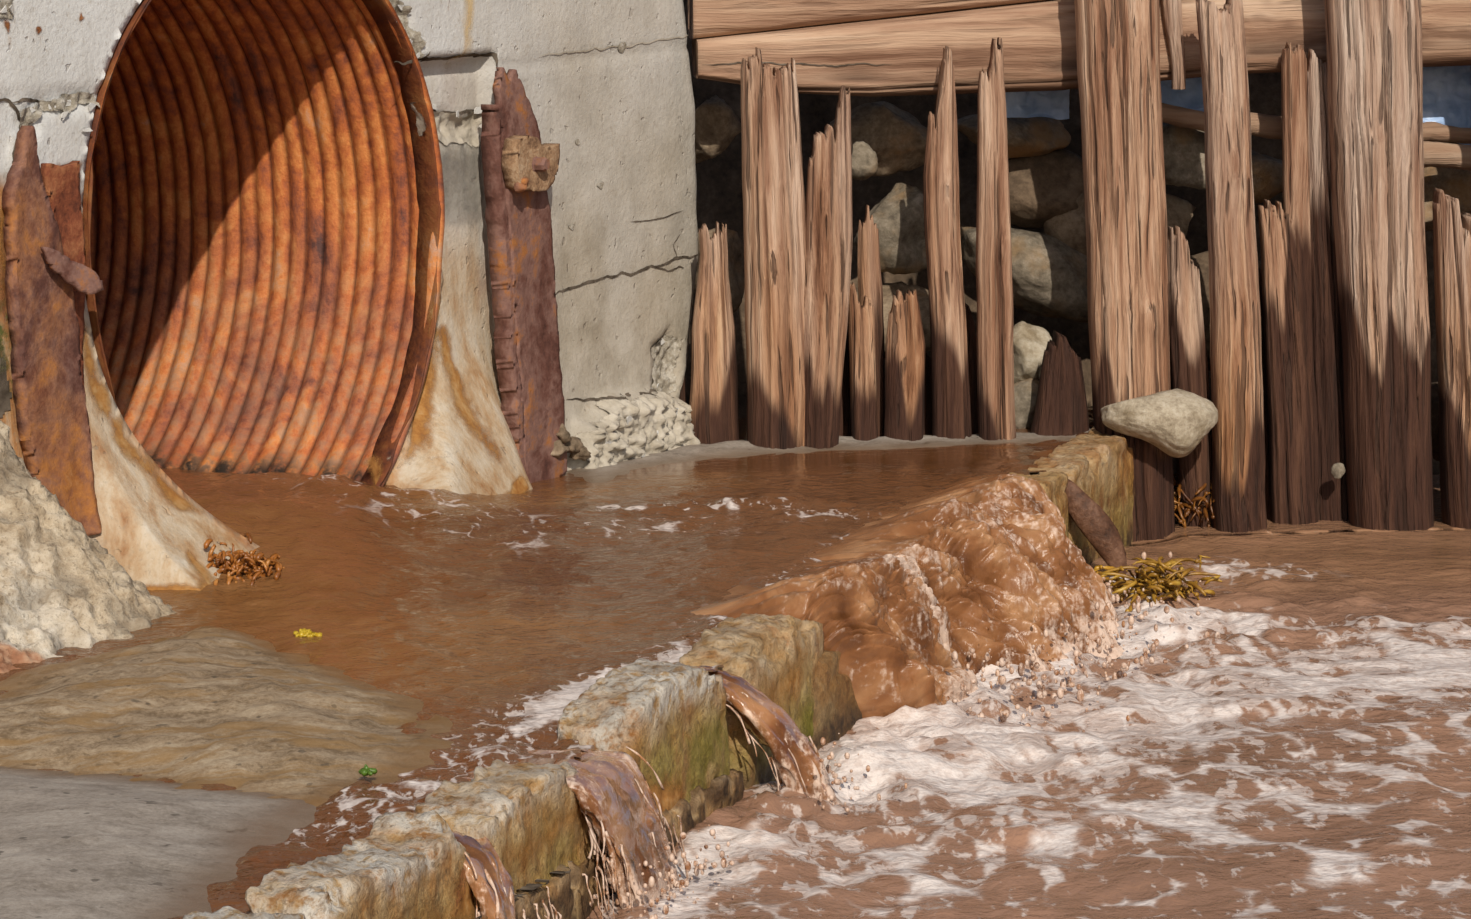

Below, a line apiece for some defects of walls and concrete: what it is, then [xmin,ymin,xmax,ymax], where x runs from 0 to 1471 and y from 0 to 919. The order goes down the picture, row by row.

spalling [389,0,427,59]
crack [556,210,699,294]
corrosion [83,329,191,511]
corrosion [407,299,502,459]